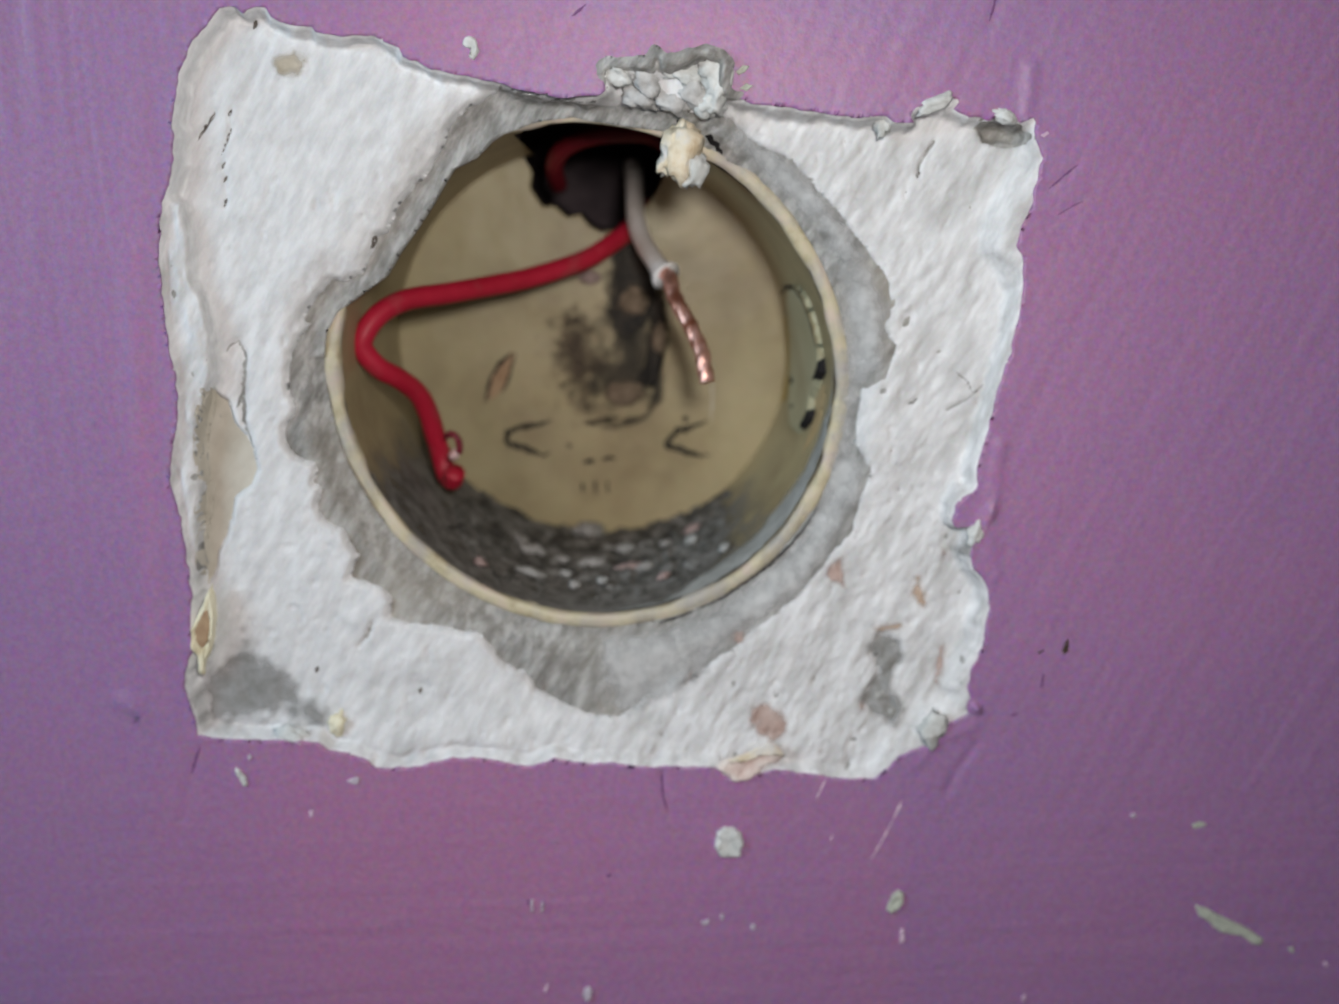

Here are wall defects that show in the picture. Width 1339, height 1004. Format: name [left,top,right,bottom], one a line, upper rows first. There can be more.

spalling [159,7,1050,787]